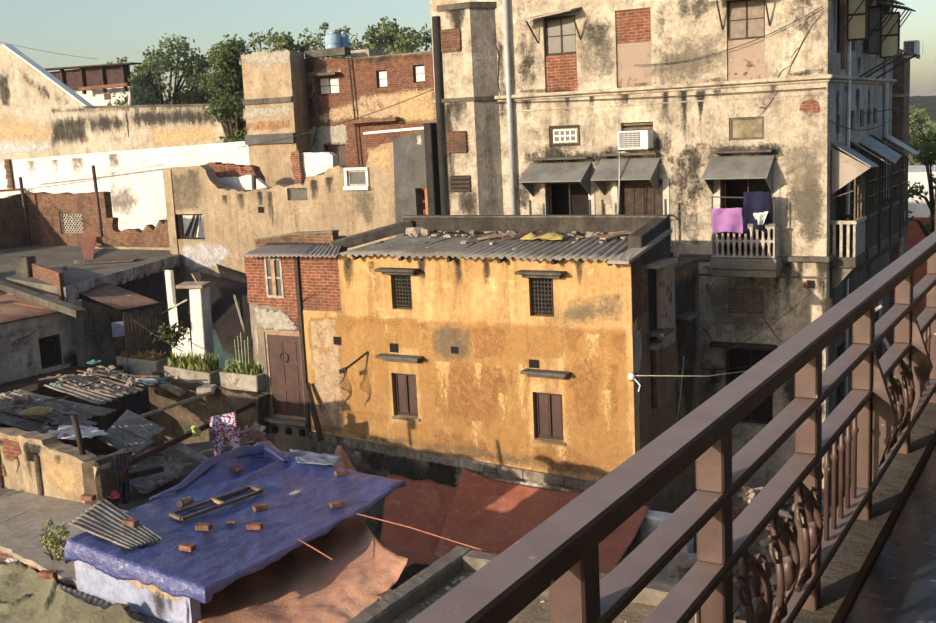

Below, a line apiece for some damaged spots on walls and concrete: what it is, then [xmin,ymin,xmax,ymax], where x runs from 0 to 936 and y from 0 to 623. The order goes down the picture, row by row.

leakage [0,76,10,105]
leakage [25,76,215,146]
flaking render [799,99,820,113]
leakage [525,133,821,244]
peeling [309,255,647,476]
flaking render [0,438,21,477]